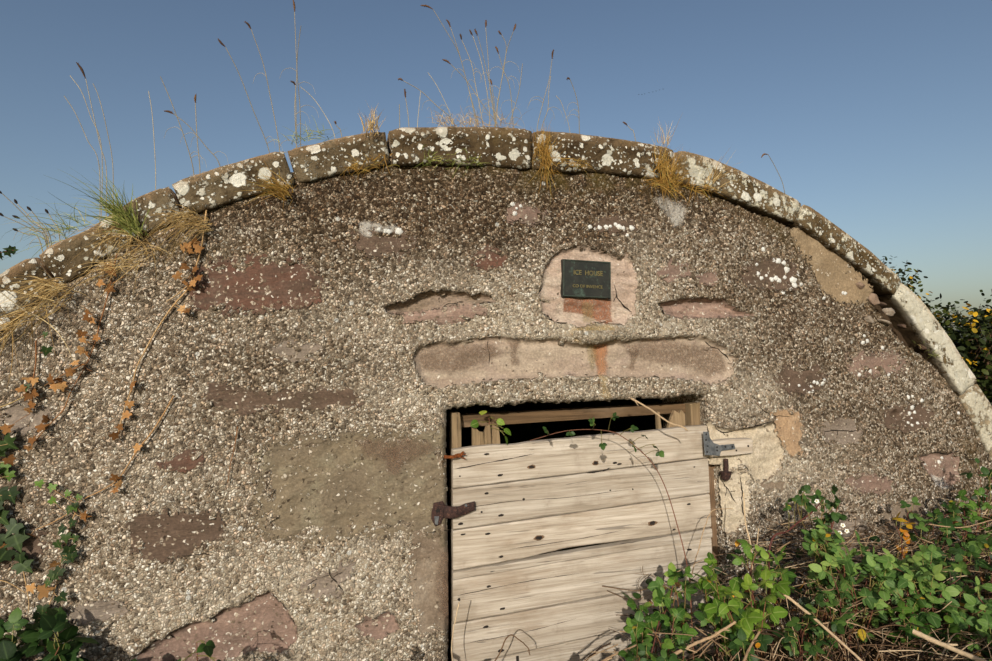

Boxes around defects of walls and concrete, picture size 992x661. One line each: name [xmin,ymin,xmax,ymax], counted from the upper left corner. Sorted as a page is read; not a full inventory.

peeling [739,227,874,307]
spalling [773,359,828,396]
peeling [247,425,448,640]
peeling [706,408,804,533]